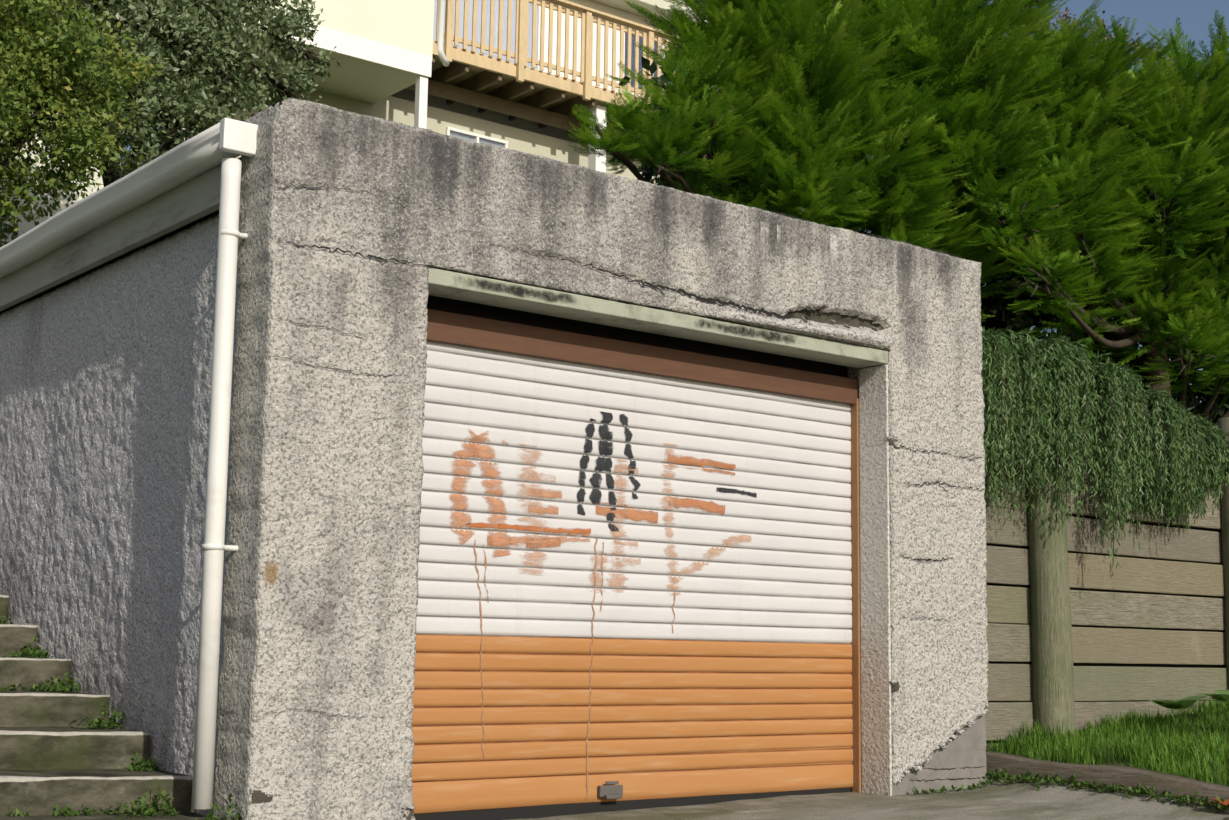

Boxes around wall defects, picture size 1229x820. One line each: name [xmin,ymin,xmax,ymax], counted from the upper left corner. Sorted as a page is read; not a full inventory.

crack [276,240,435,267]
crack [479,244,794,319]
spalling [788,304,883,331]
crack [899,445,984,491]
crack [902,555,953,563]